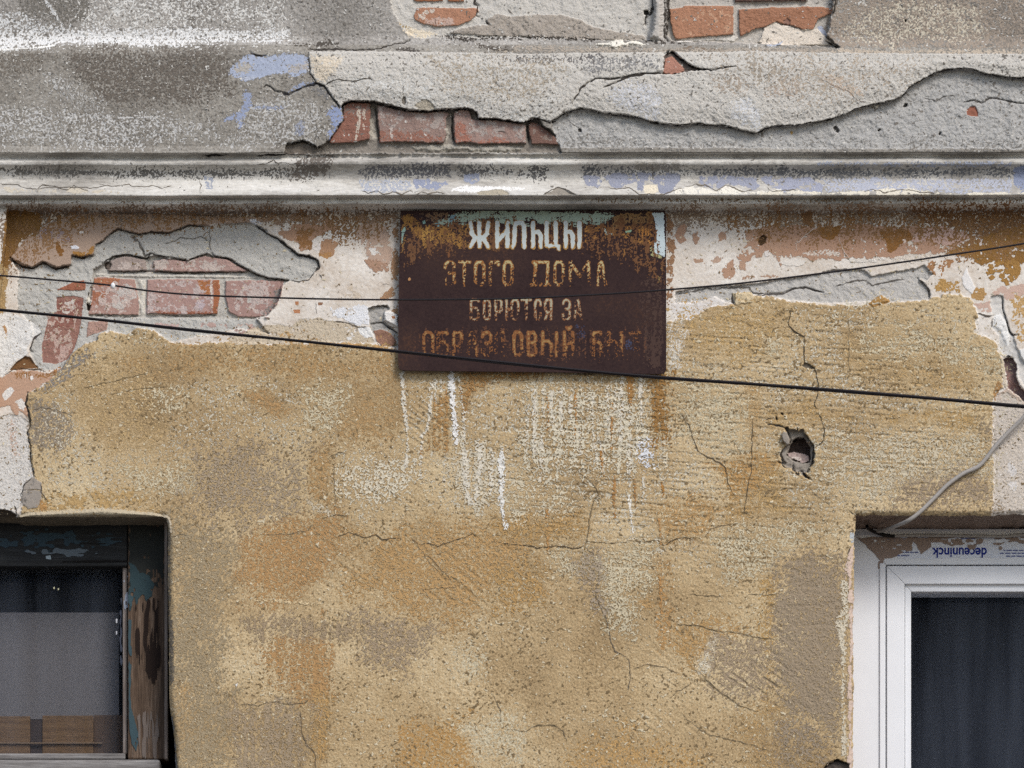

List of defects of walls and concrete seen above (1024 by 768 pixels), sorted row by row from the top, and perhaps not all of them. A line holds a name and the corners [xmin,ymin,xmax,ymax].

crack [264,0,1024,143]
flaking render [284,0,1024,154]
spalling [0,212,400,417]
spalling [675,224,982,304]
spalling [962,267,1024,404]
water stain [0,275,1024,768]
crack [267,220,930,711]
spalling [776,413,814,479]